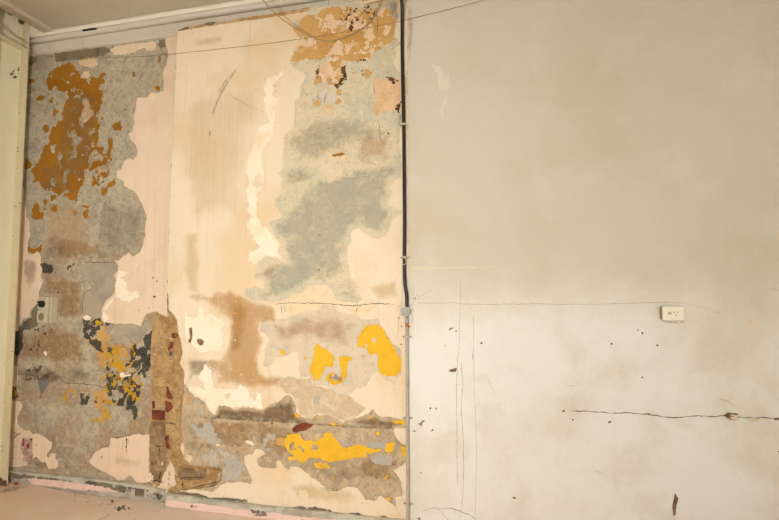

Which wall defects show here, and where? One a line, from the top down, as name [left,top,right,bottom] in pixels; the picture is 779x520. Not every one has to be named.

peeling [9,0,424,506]
crack [424,279,723,519]
crack [577,399,779,422]